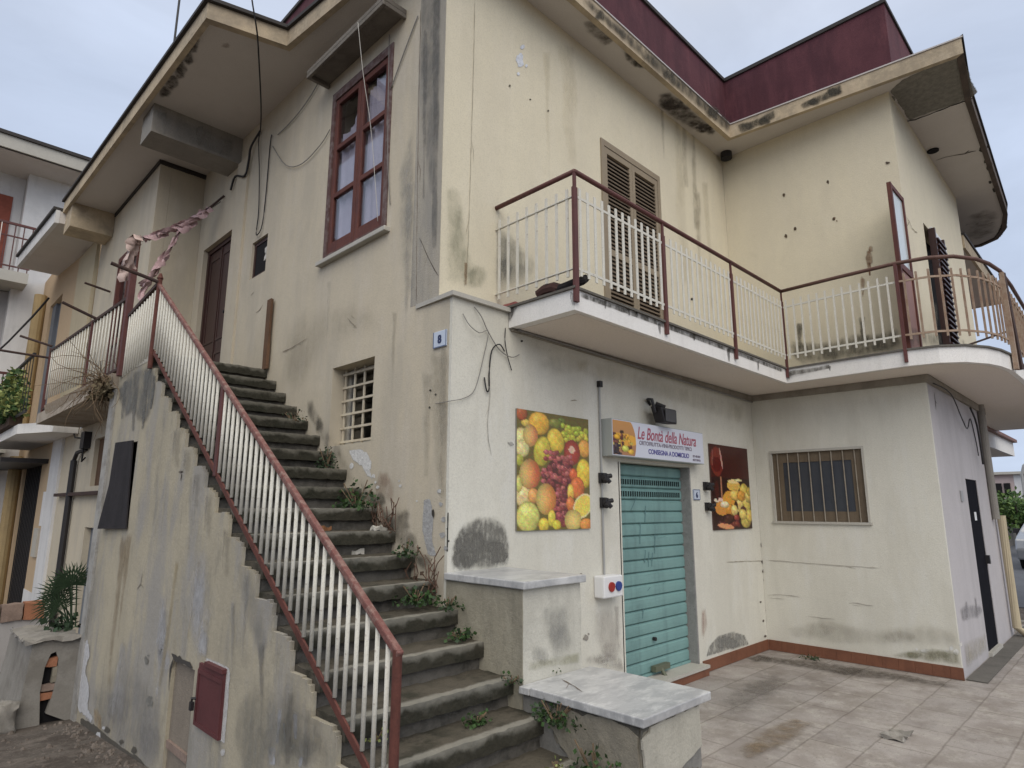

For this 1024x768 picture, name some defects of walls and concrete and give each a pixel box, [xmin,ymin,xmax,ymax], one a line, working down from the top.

water stain [589,3,774,133]
water stain [802,86,841,106]
water stain [119,369,155,430]
peeling [349,449,379,489]
peeling [416,489,449,556]
water stain [453,520,508,568]
water stain [707,633,748,656]